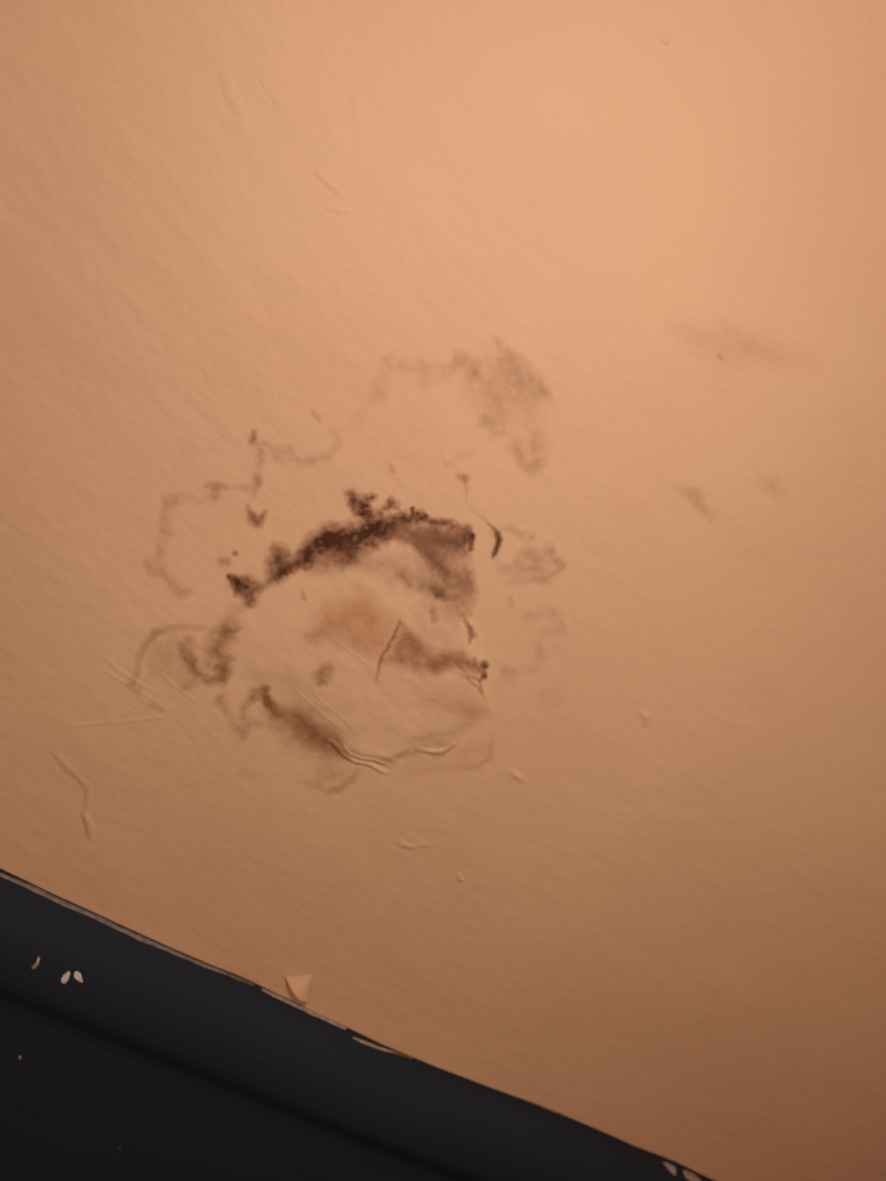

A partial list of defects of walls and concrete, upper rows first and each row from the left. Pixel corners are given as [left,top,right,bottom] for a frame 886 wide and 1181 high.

leakage [269,492,475,598]
mould [227,574,255,605]
leakage [262,687,281,716]
peeling [0,872,412,1059]
peeling [663,1162,701,1181]